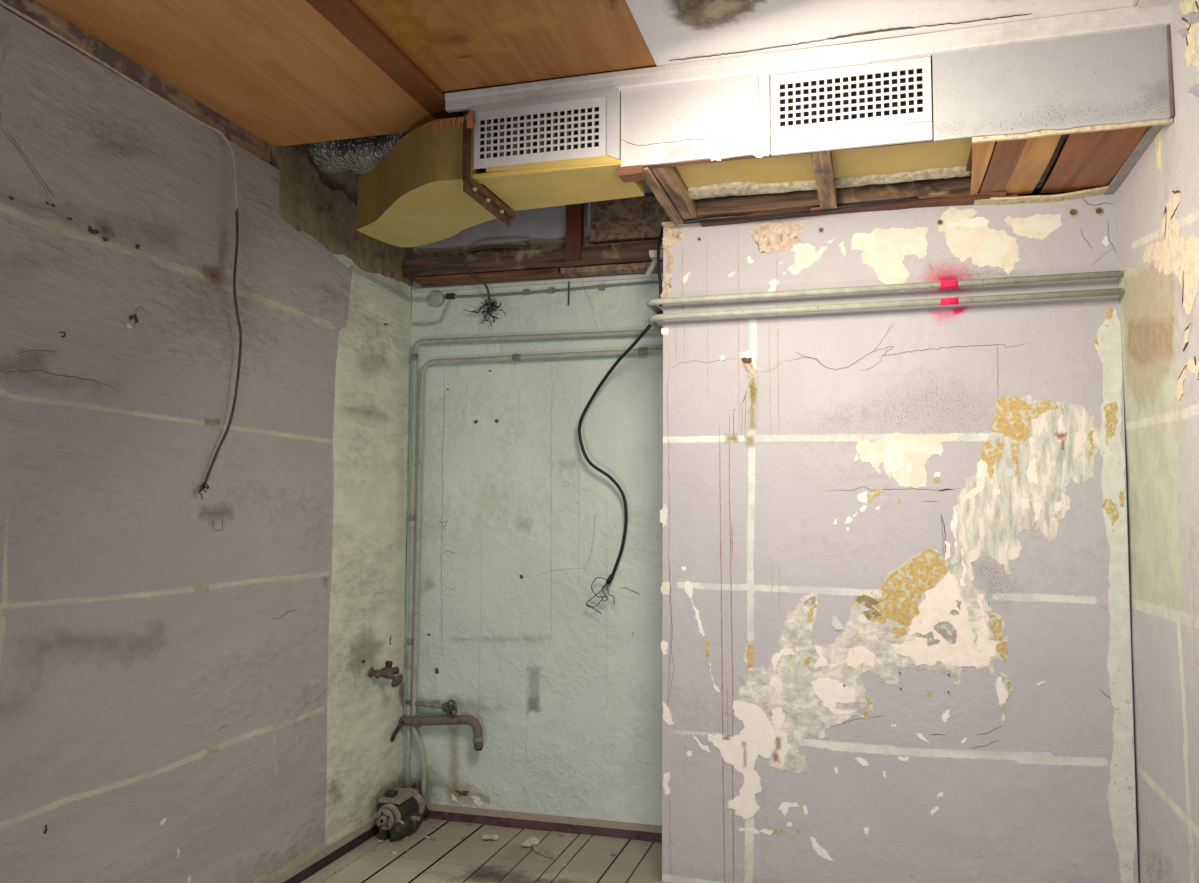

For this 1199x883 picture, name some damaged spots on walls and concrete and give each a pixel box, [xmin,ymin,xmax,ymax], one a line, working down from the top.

damp [672,0,761,27]
peeling [1176,0,1199,97]
peeling [660,227,691,298]
peeling [747,207,1062,292]
peeling [1143,190,1199,400]
crack [1,350,116,389]
crack [764,324,1025,384]
peeling [660,502,668,527]
peeling [661,566,720,692]
peeling [686,308,1137,883]
peeling [662,702,674,725]
peeling [663,772,671,795]